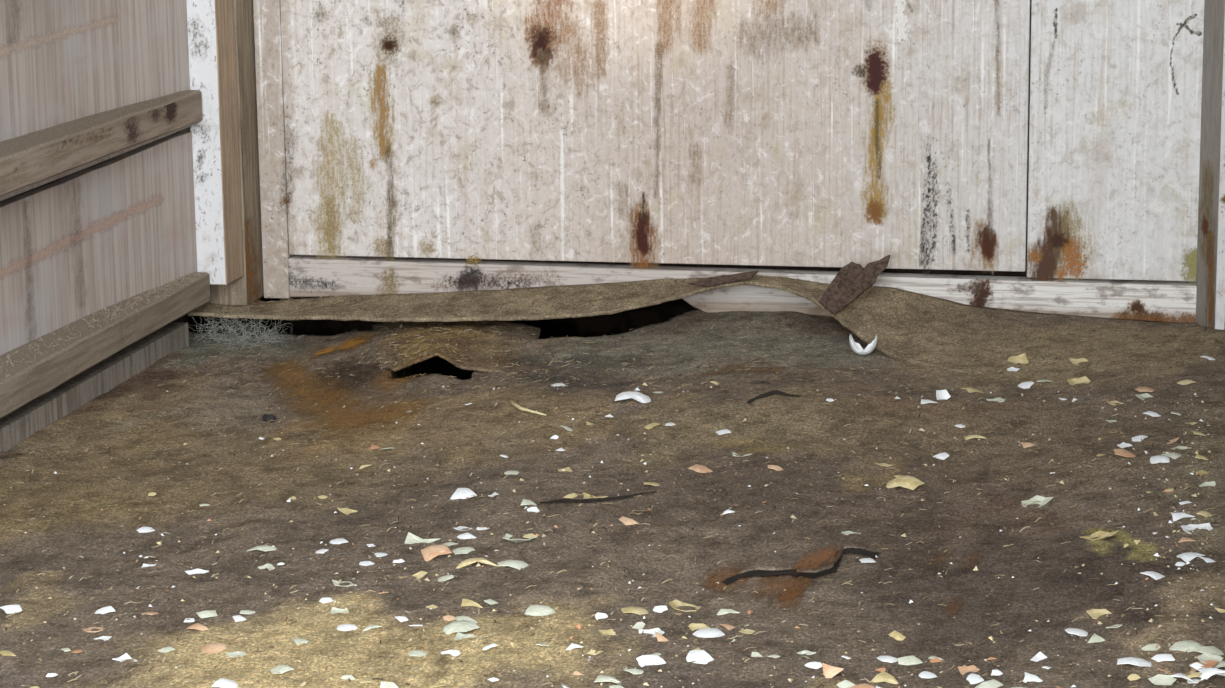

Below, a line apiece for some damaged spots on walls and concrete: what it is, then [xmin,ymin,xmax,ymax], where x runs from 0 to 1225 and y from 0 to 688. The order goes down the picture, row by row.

corrosion [525,0,572,106]
corrosion [852,44,895,225]
corrosion [629,193,657,269]
corrosion [958,207,997,307]
corrosion [1028,205,1086,281]
crack [721,532,880,585]